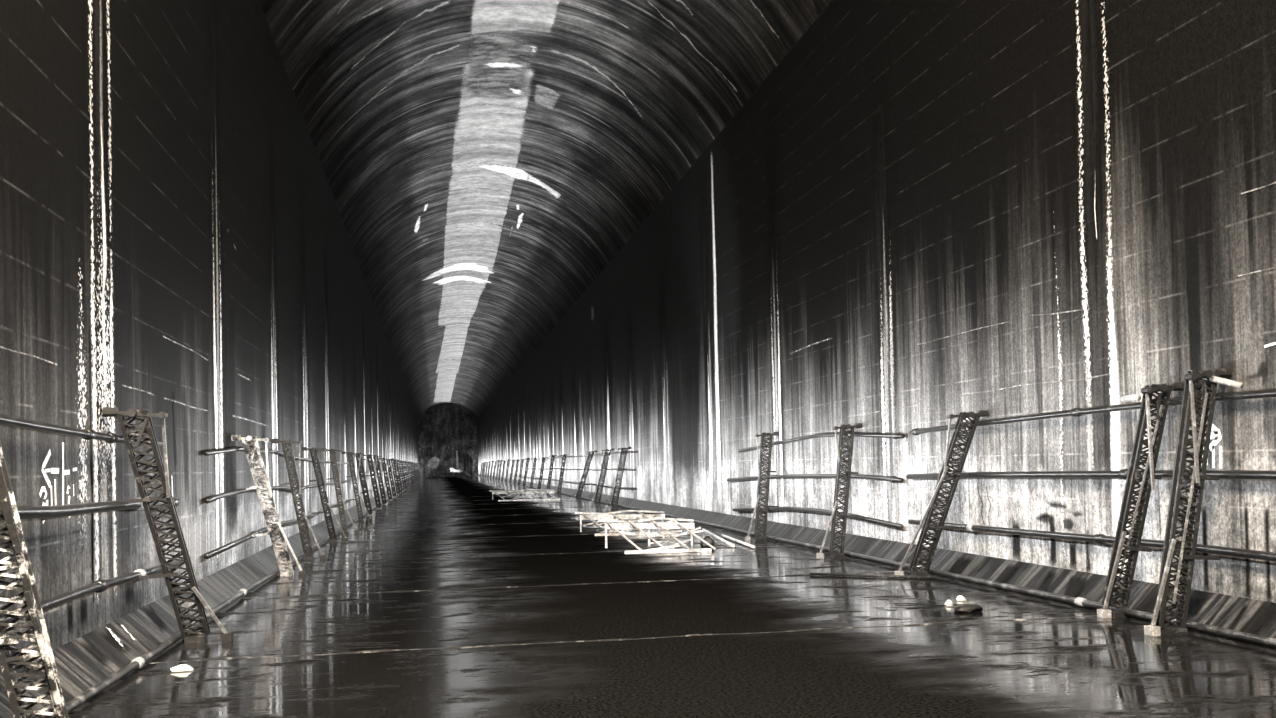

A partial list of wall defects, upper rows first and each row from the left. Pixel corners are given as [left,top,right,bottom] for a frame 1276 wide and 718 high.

leakage [76,0,118,599]
leakage [1036,293,1073,553]
leakage [1075,0,1122,558]